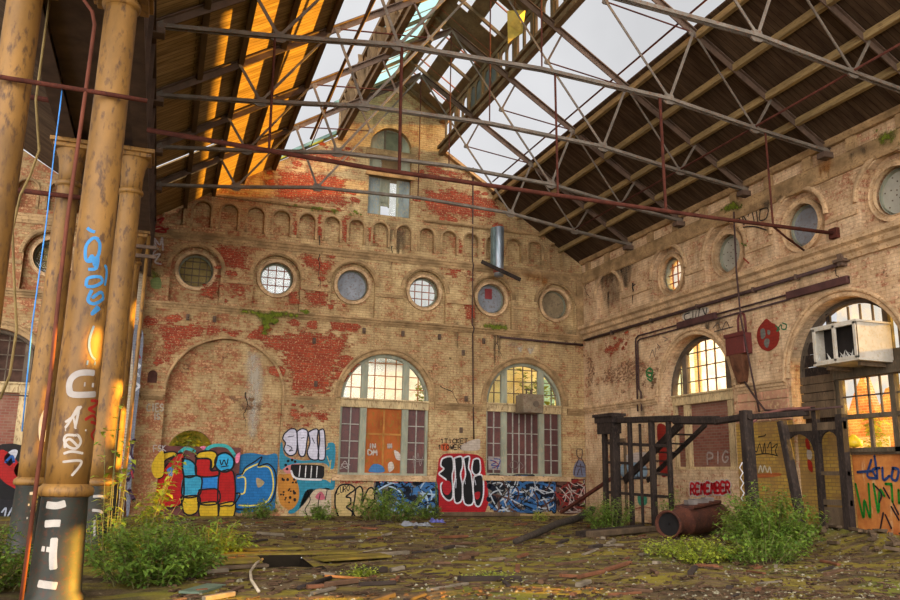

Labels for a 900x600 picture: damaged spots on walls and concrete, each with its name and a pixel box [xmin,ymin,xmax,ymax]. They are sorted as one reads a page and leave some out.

peeling [265,141,361,246]
peeling [413,166,504,227]
peeling [143,314,361,428]